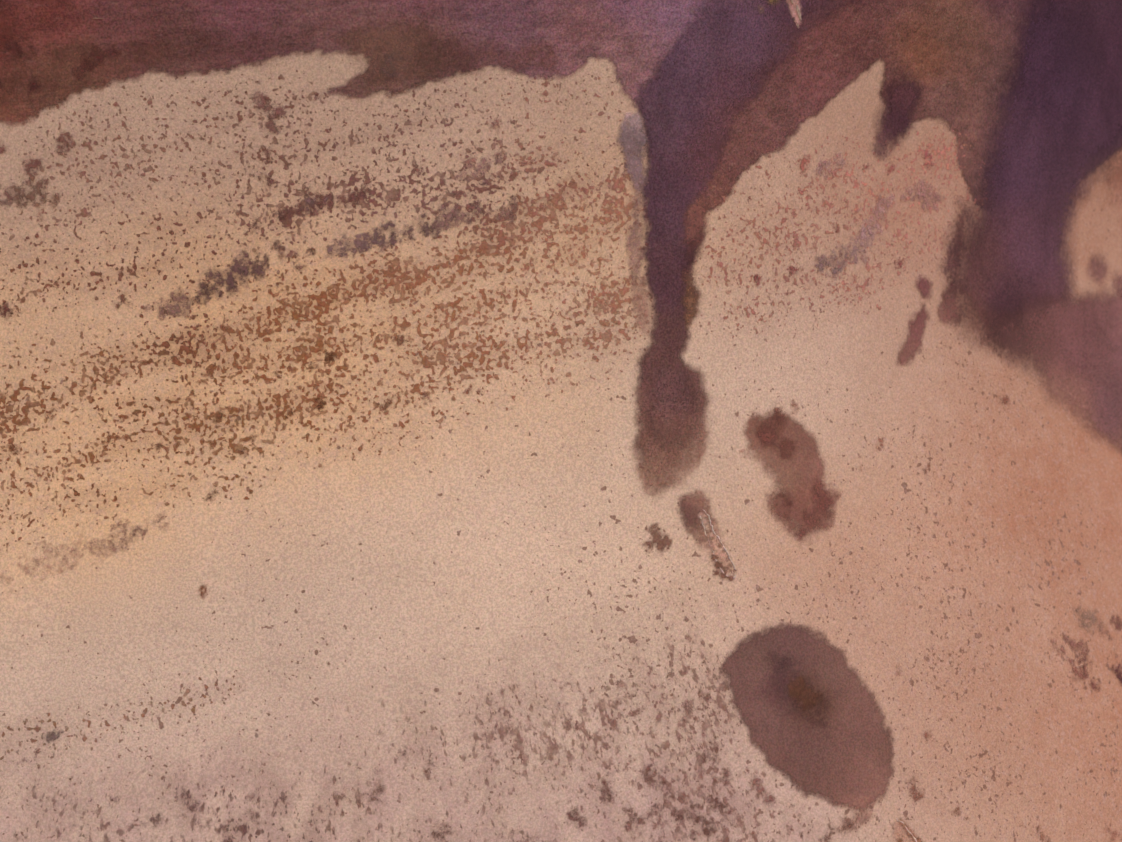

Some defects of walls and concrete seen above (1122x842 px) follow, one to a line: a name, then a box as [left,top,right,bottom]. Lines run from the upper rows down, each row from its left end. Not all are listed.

rust [0,70,653,551]
leakage [0,0,1122,492]
leakage [745,400,841,537]
leakage [395,617,894,842]
leakage [33,786,133,842]
leakage [215,787,295,842]
leakage [324,769,384,842]